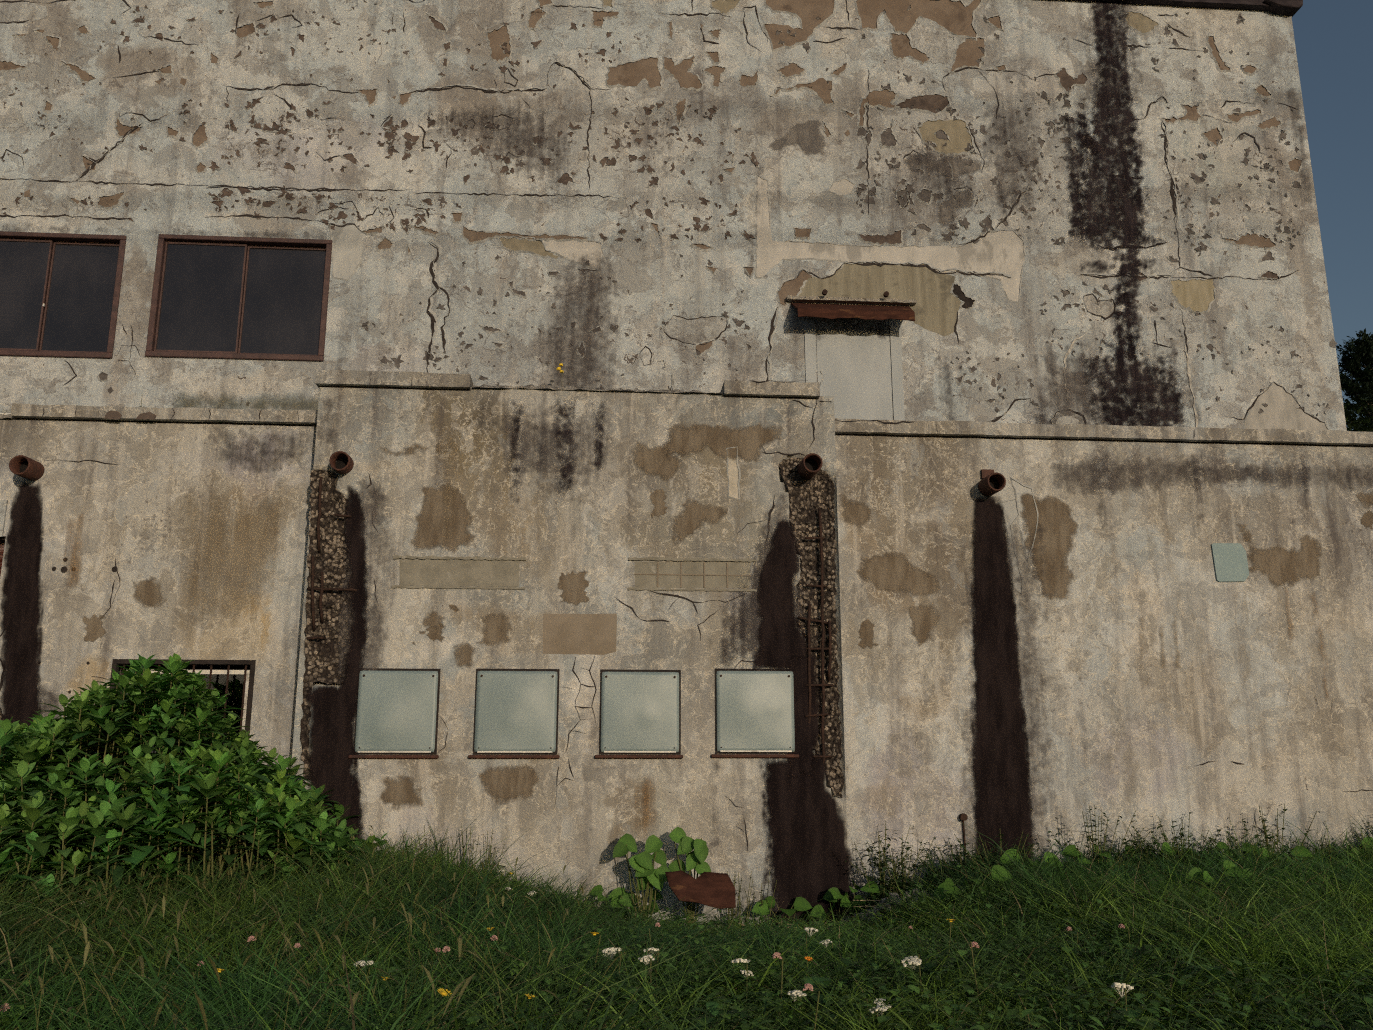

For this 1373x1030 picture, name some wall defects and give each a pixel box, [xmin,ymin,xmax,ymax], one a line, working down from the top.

crack [0,60,617,385]
peeling [67,0,1096,394]
crack [750,66,1056,456]
water stain [1041,1,1183,427]
crack [986,95,1325,442]
peeling [1158,35,1303,282]
water stain [1,482,60,728]
rust [665,870,736,909]
water stain [723,505,854,927]
spalling [778,458,871,798]
water stain [970,496,1046,868]
peeling [1021,494,1078,599]